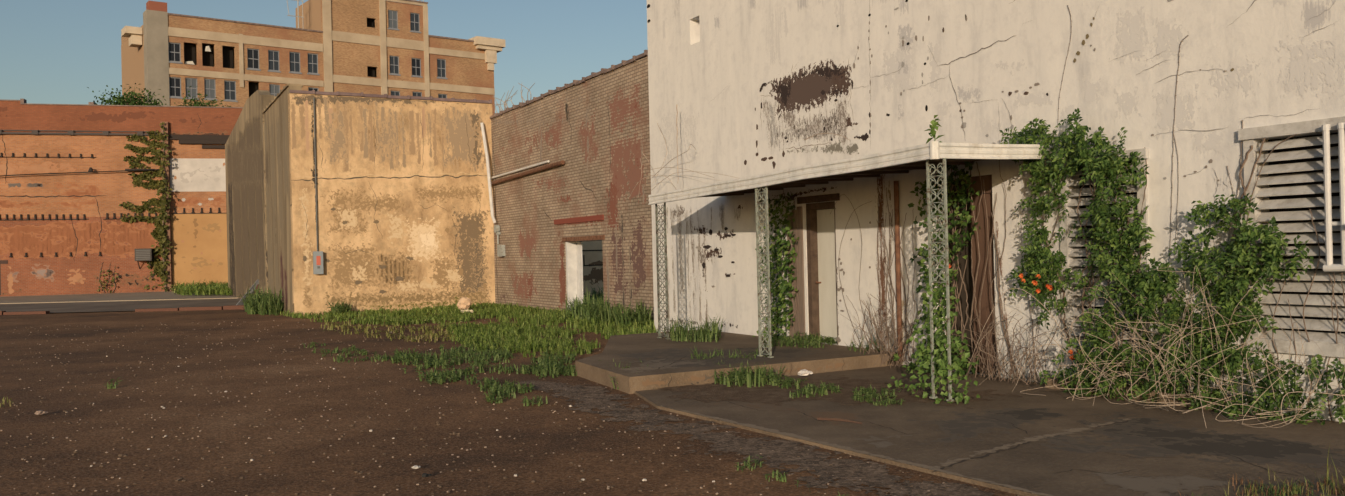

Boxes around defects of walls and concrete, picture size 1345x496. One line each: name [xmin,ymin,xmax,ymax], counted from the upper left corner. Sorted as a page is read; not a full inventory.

damp [169,94,641,310]
peeling [525,72,649,308]
damp [663,205,740,328]
peeling [692,225,736,292]
damp [602,347,845,386]
damp [762,94,859,155]
spalling [744,21,888,169]
damp [871,174,908,365]
crack [760,0,1029,151]
damp [894,0,915,75]
damp [994,221,1052,383]
damp [661,403,1345,496]